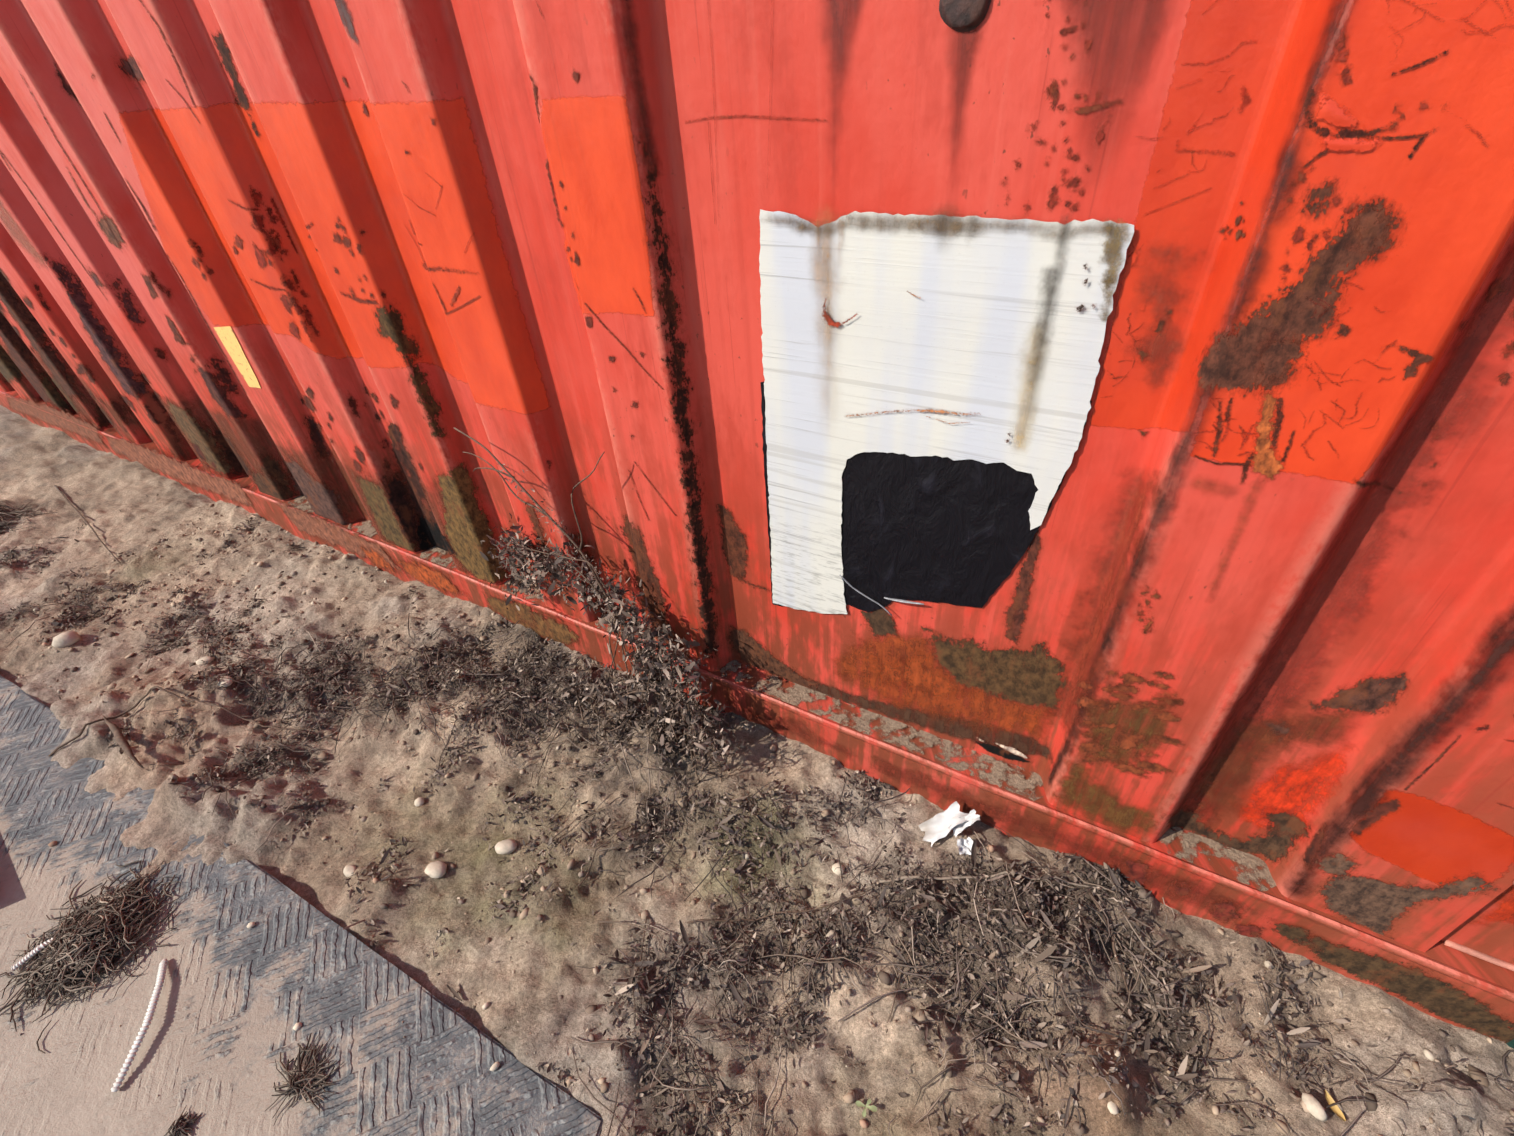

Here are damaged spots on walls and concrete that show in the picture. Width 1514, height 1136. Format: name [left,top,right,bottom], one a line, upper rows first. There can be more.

rust [0,255,579,645]
rust [620,0,817,687]
rust [828,0,858,74]
rust [1271,148,1294,212]
rust [1197,181,1402,404]
rust [1304,5,1340,99]
peeling [979,739,1027,758]
rust [841,432,1192,783]
rust [880,761,1514,1043]
rust [1168,611,1514,940]